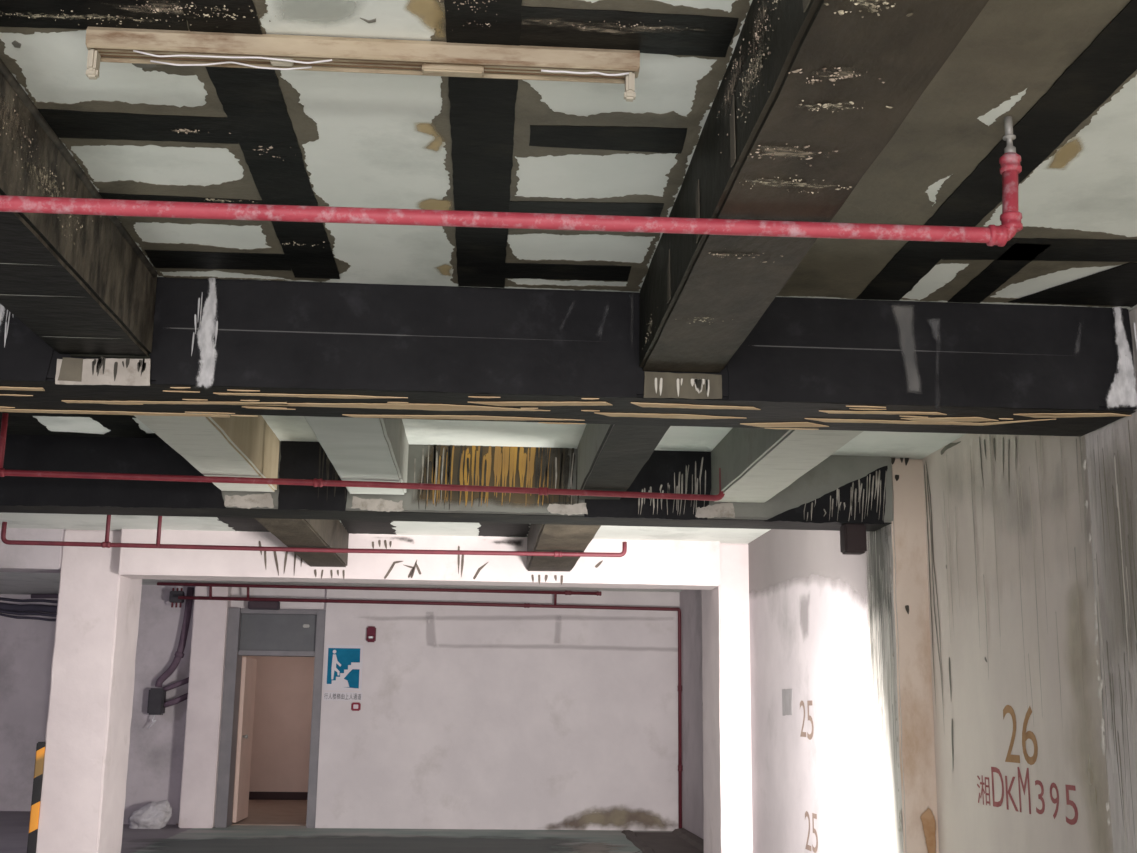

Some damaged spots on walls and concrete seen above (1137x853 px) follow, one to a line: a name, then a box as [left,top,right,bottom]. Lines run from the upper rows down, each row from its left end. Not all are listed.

damp [748,457,909,818]
damp [924,464,960,758]
damp [941,434,1062,722]
damp [1060,420,1137,853]